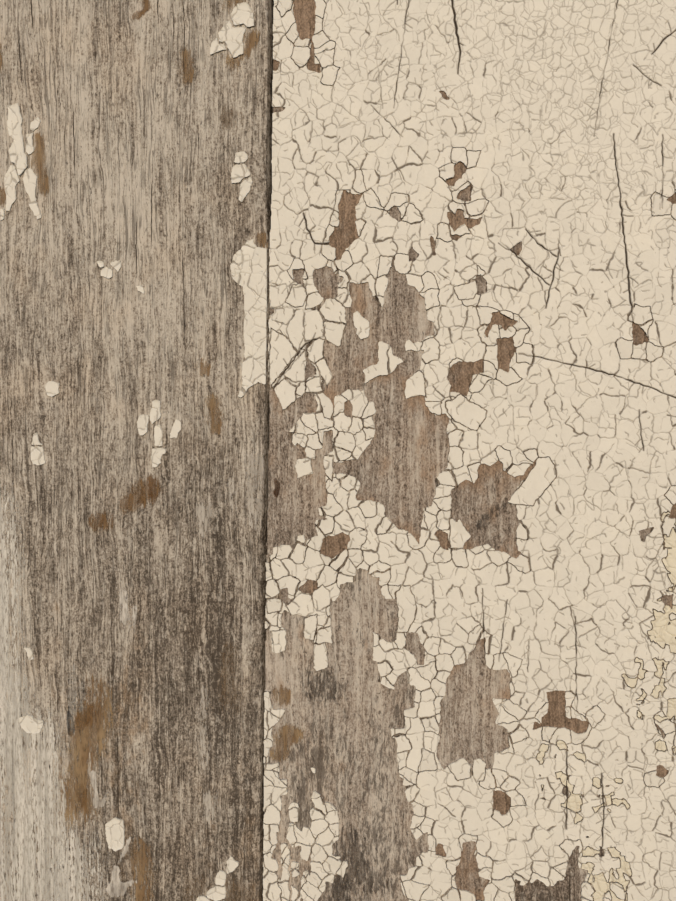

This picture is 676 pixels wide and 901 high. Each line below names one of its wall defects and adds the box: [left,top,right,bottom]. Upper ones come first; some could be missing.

peeling [210,2,254,58]
crack [451,0,462,67]
peeling [0,103,41,220]
peeling [430,148,488,255]
crack [595,80,638,312]
crack [508,230,560,305]
crack [274,335,320,387]
crack [533,356,676,416]
peeling [230,170,632,901]
peeling [105,817,125,852]
crack [598,773,606,856]
peeling [196,856,239,901]